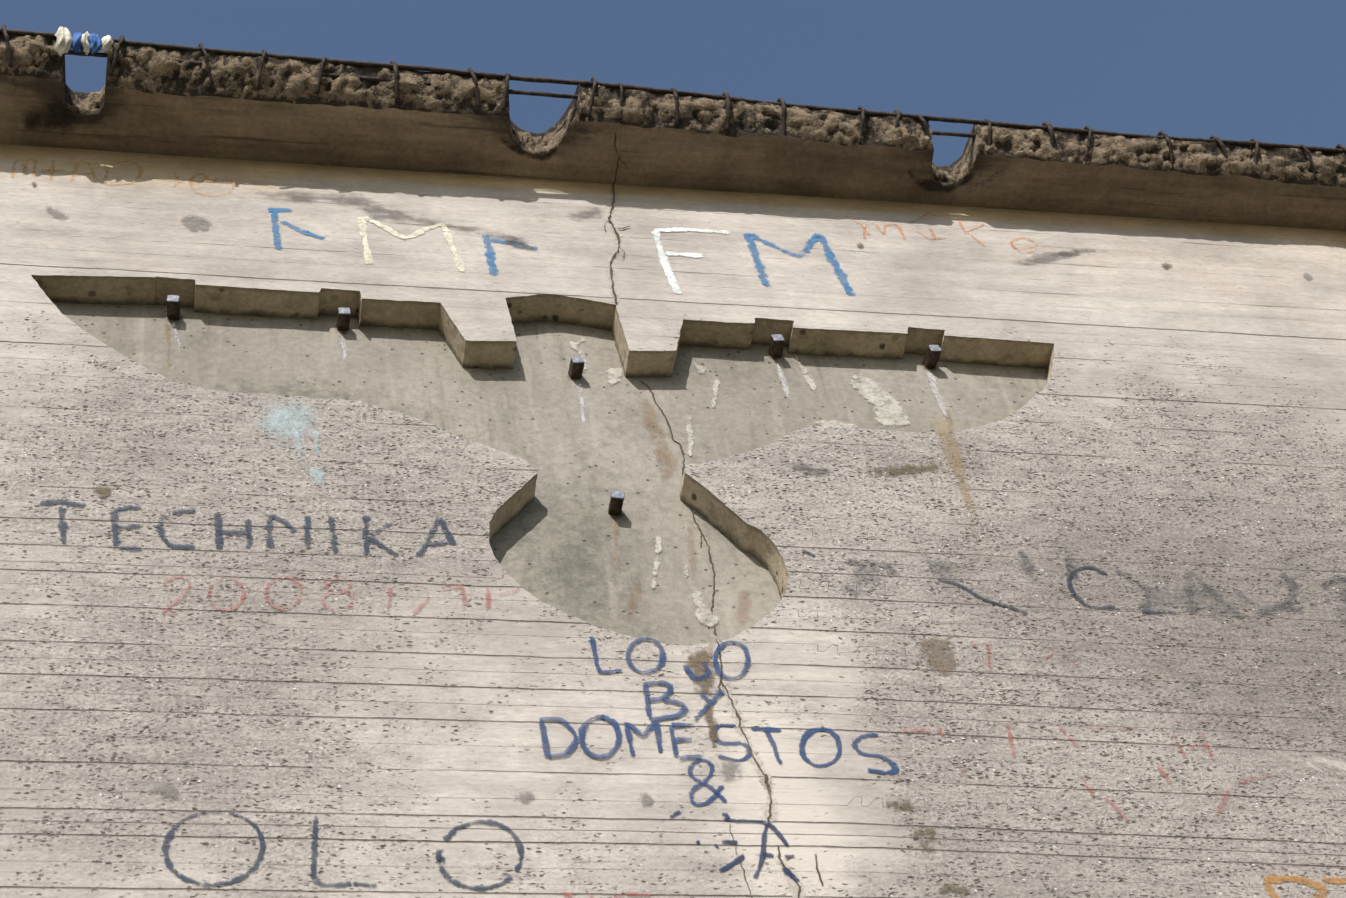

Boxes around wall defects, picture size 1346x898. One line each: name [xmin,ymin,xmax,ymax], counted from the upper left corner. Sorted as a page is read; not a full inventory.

spalling [0,24,1346,188]
crack [604,132,630,303]
crack [641,381,685,476]
crack [691,510,823,898]